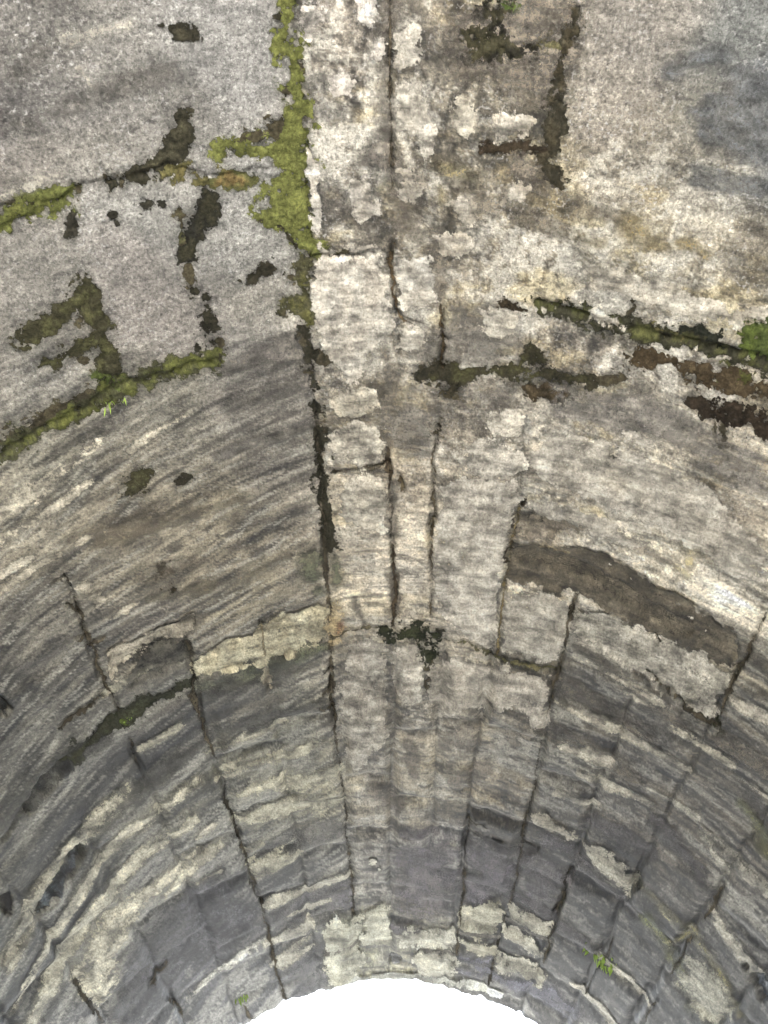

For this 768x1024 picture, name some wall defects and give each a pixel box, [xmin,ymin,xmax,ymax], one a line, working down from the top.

damp [442,0,584,109]
damp [211,0,520,474]
crack [386,242,413,324]
damp [0,437,105,543]
damp [386,491,399,547]
crack [428,434,439,569]
damp [522,361,768,494]
spalling [106,604,330,689]
peeling [338,408,768,773]
crack [444,505,578,985]
crack [185,639,287,999]
crack [73,977,104,1023]